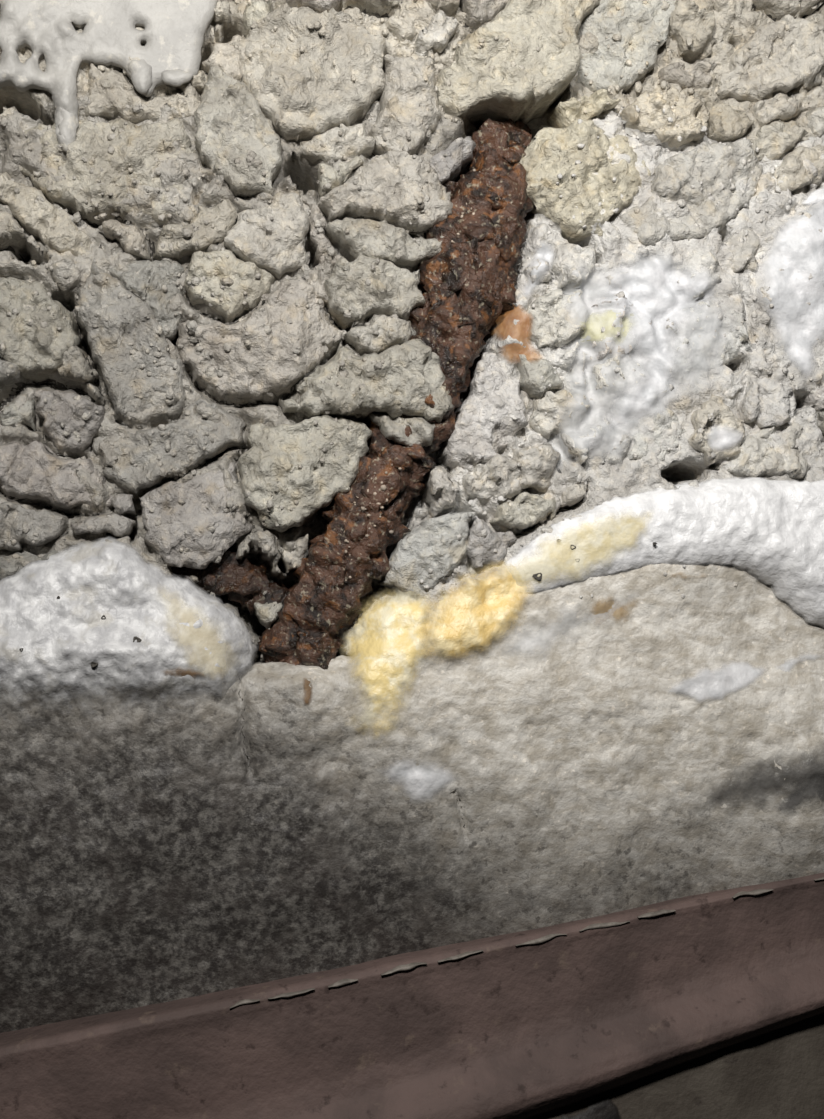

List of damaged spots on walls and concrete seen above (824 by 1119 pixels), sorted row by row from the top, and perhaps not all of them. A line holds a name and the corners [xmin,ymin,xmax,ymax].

crack [0,246,30,262]
crack [0,310,109,412]
crack [81,216,155,301]
crack [187,295,265,325]
crack [189,306,370,408]
spalling [0,0,824,664]
corrosion [495,303,539,361]
efflorescence [524,244,553,293]
efflorescence [555,257,724,457]
efflorescence [764,188,824,370]
corrosion [348,566,526,725]